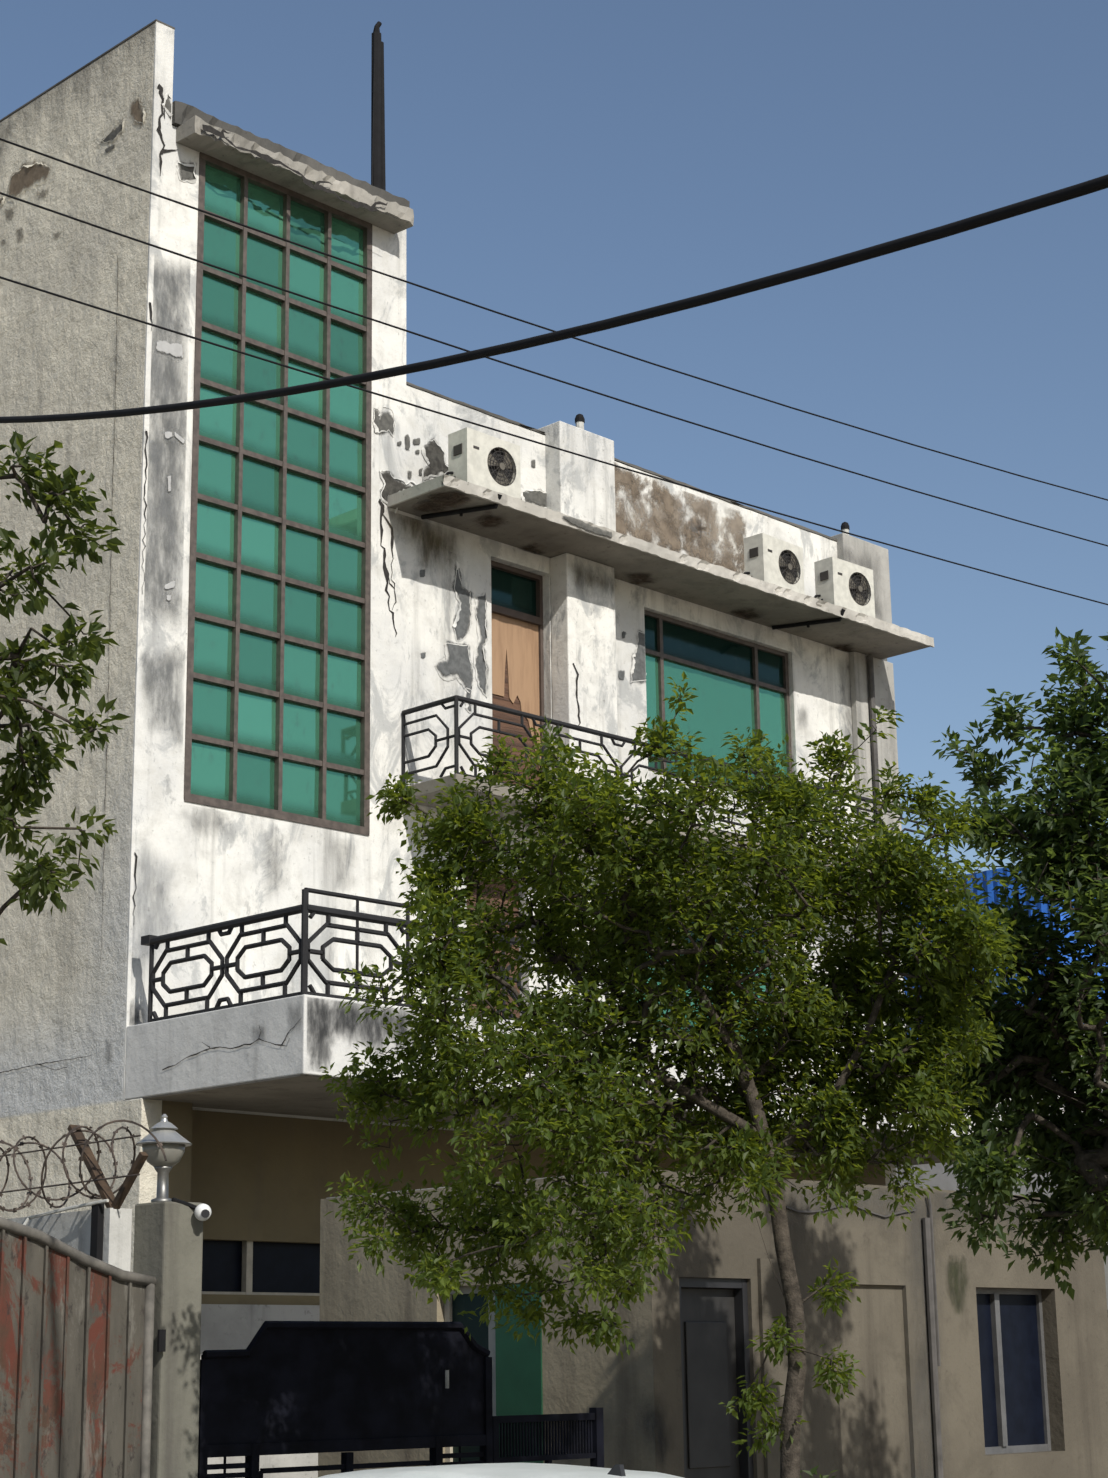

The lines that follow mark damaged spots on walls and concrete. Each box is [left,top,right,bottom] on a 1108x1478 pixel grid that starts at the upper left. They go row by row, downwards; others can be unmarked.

peeling [0,162,51,244]
peeling [101,93,173,153]
peeling [176,162,196,183]
crack [157,84,397,219]
peeling [373,406,448,505]
crack [378,499,397,637]
peeling [421,561,488,713]
crack [162,1023,297,1070]